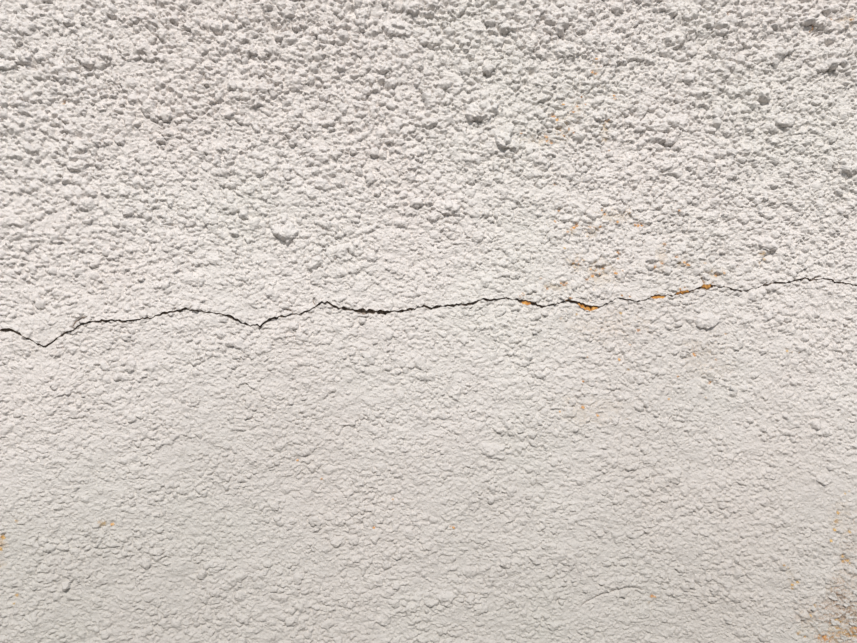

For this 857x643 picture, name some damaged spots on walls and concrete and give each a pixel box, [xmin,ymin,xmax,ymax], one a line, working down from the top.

crack [0,275,857,348]